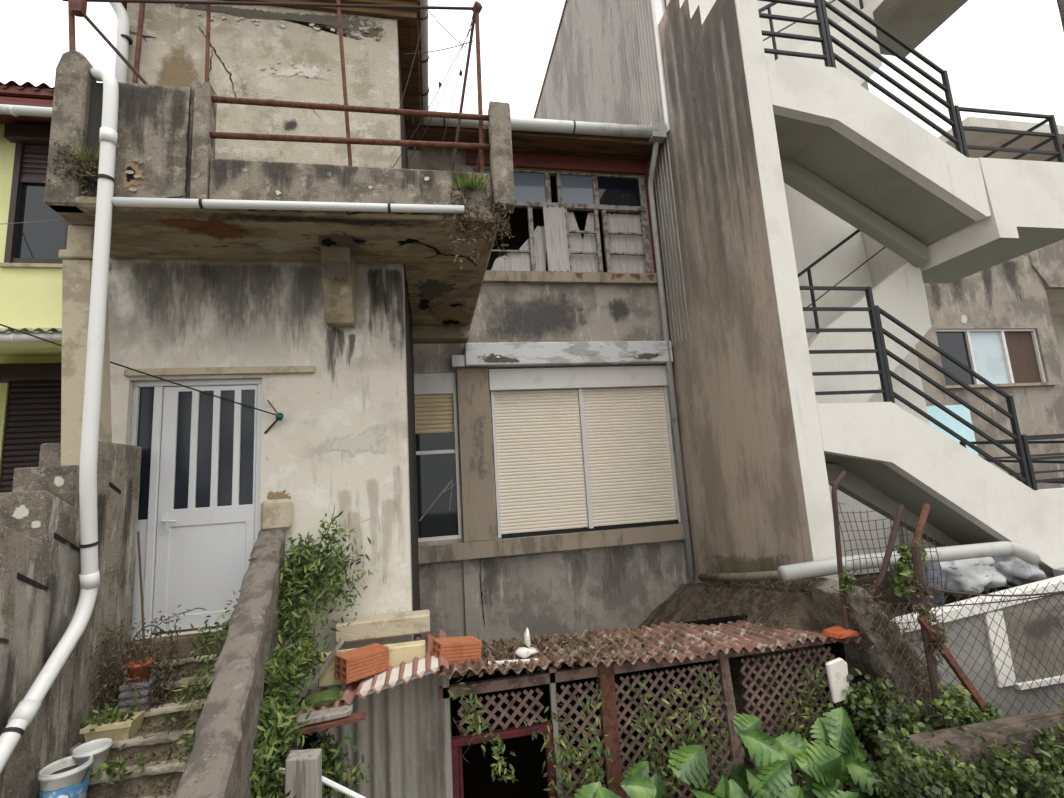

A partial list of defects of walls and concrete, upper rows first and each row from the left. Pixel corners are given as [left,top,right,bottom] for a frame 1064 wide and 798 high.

crack [167,28,236,199]
crack [345,209,446,217]
crack [414,241,480,266]
leakage [368,269,404,344]
spalling [408,277,474,327]
leakage [492,295,582,338]
leakage [610,300,628,320]
leakage [327,328,355,372]
peeling [478,353,519,363]
peeling [628,349,660,359]